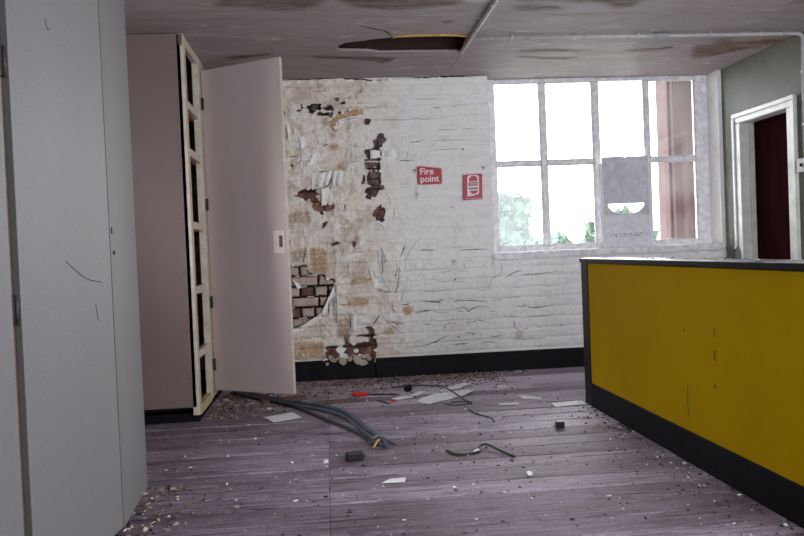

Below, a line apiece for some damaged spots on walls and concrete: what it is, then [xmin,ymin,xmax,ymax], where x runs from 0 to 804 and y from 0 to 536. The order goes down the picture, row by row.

peeling [297,97,371,129]
spalling [295,169,344,228]
spalling [361,131,388,223]
flaking render [291,265,338,333]
spalling [321,313,379,366]